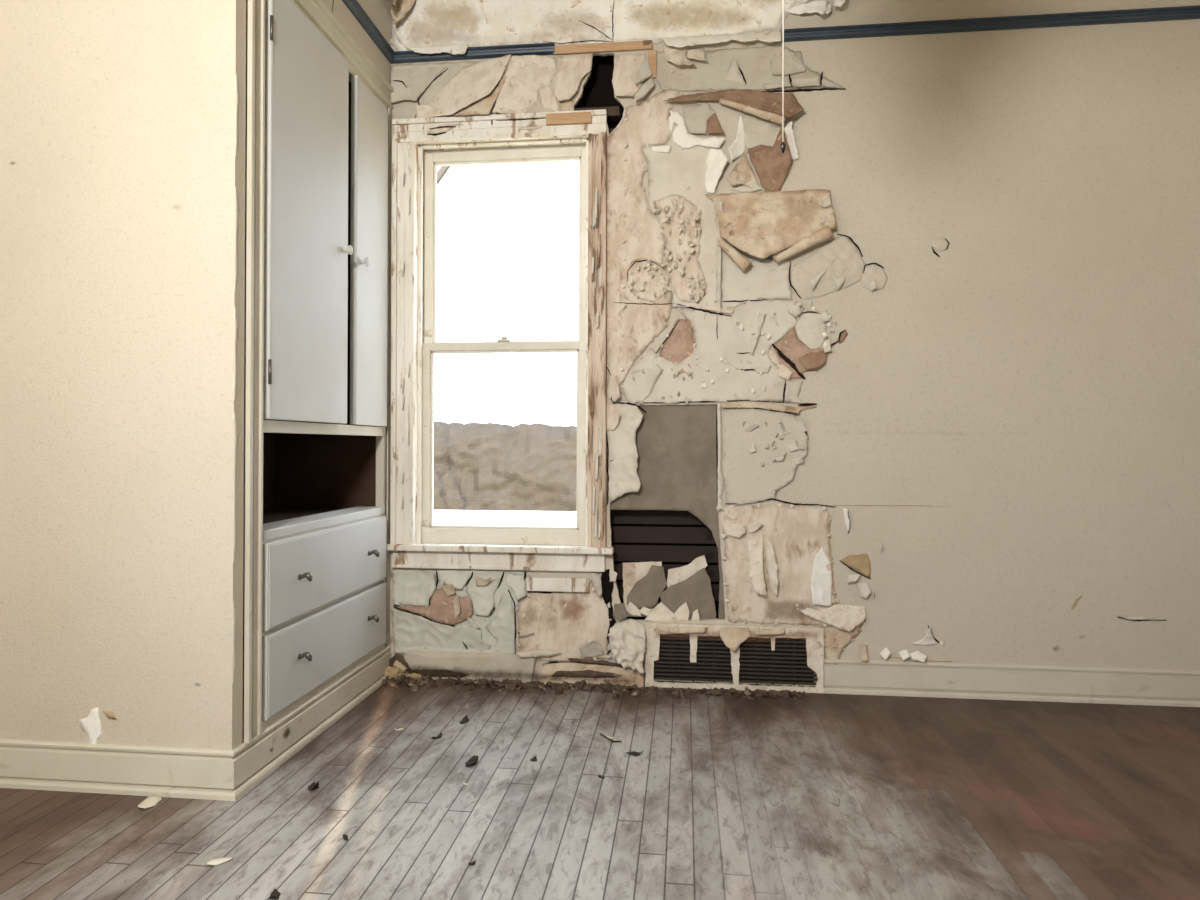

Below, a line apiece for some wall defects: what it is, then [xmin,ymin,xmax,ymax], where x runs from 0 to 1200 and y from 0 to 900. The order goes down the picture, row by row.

damp [395,0,798,50]
flaking render [389,0,952,674]
peeling [79,707,116,744]